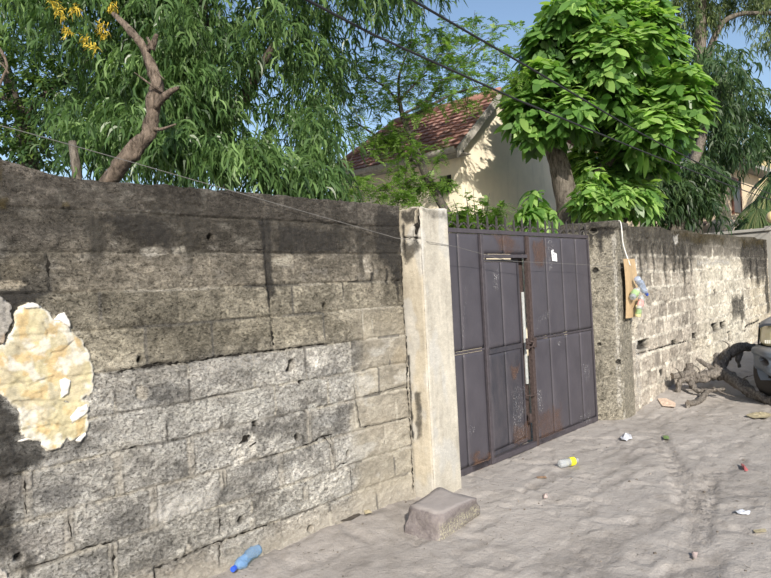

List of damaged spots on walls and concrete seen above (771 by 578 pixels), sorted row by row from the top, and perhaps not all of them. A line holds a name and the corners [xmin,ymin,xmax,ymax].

leakage [259,213,345,303]
leakage [589,222,615,252]
leakage [626,228,729,282]
leakage [732,297,745,321]
leakage [741,238,770,313]
flaking render [0,279,94,451]
leakage [407,355,421,439]
leakage [0,401,39,479]
leakage [0,513,36,573]